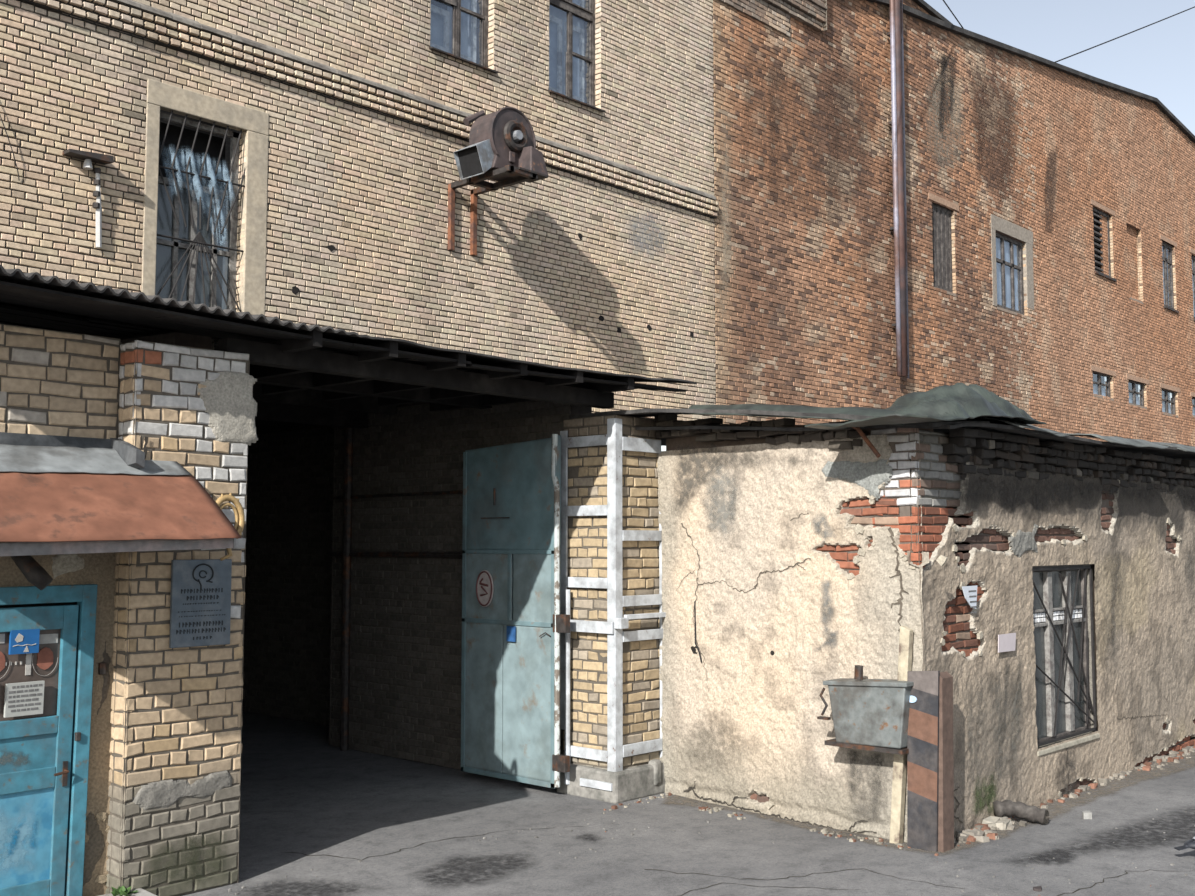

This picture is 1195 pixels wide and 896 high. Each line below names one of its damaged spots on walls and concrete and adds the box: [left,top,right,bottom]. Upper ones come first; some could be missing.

damp [929,55,960,158]
flaking render [816,428,1016,657]
flaking render [1034,526,1088,545]
flaking render [1100,480,1120,531]
crack [677,523,811,691]
flaking render [1135,718,1195,767]